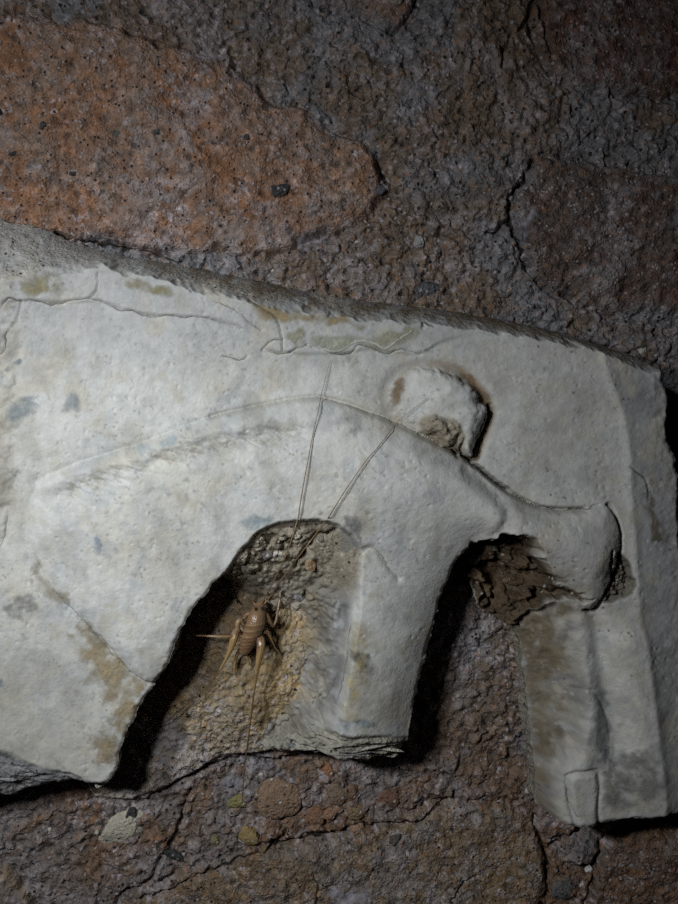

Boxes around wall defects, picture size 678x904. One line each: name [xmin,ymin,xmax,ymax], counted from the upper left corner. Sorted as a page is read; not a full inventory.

crack [502,0,552,67]
crack [487,164,531,267]
crack [116,750,454,904]
crack [532,814,573,903]